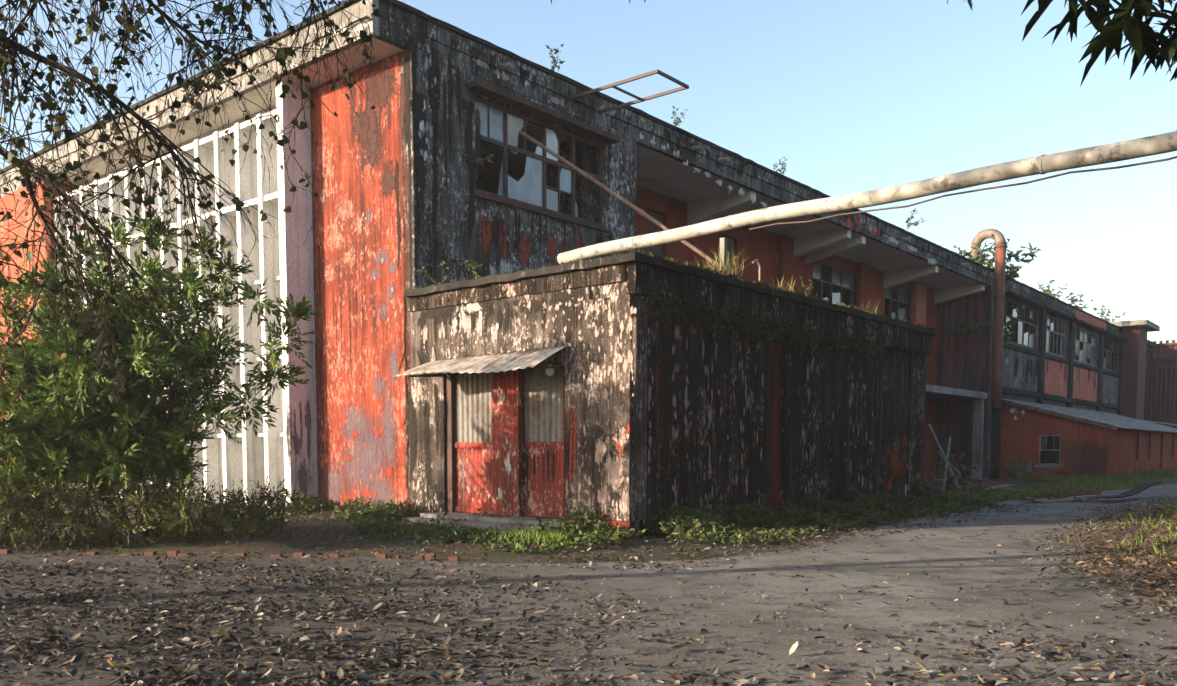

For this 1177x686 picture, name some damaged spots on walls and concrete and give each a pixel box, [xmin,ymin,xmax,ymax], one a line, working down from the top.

leakage [350,23,497,288]
peeling [319,189,397,322]
peeling [480,213,531,275]
leakage [492,212,542,254]
peeling [547,226,586,263]
peeling [324,348,399,505]
peeling [421,303,499,361]
peeling [523,289,654,473]
flaking render [595,421,630,521]
peeling [672,325,764,512]
leakage [604,302,869,487]